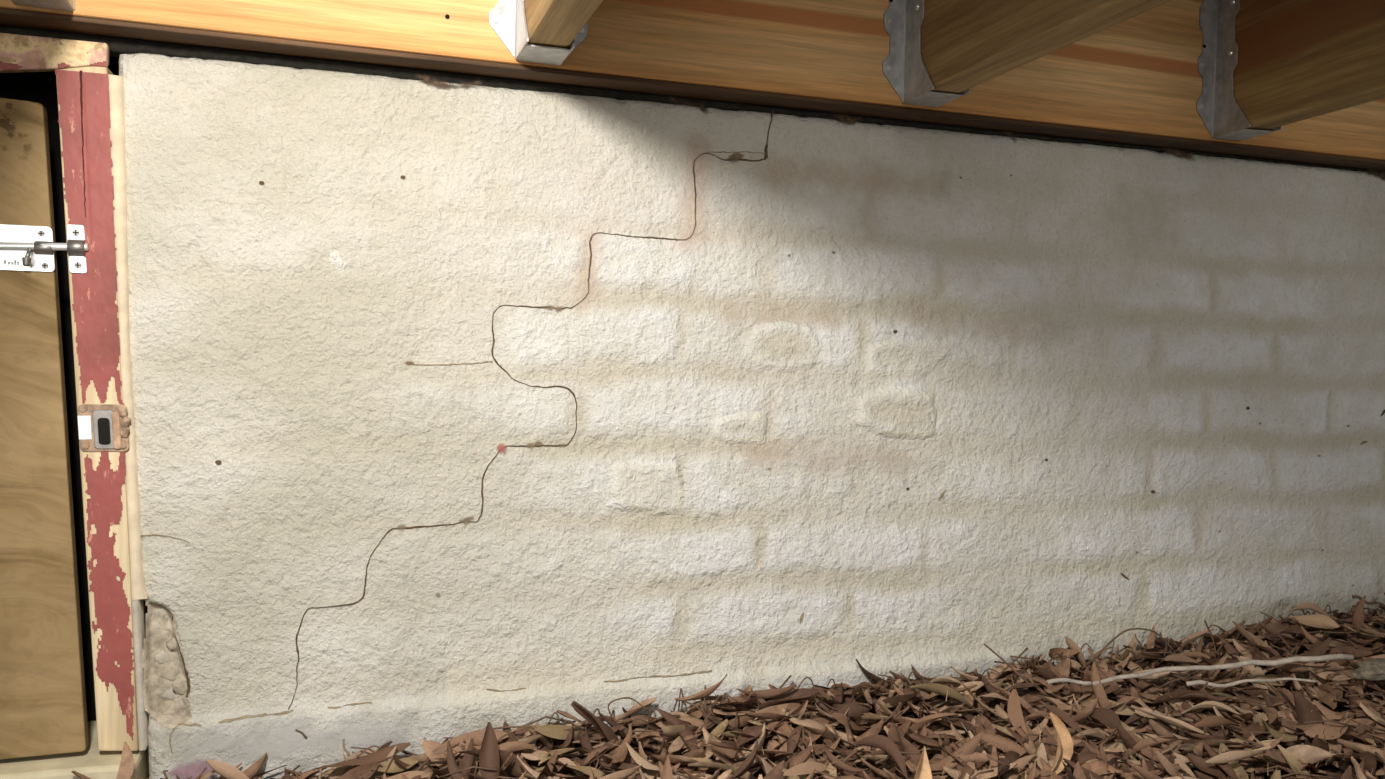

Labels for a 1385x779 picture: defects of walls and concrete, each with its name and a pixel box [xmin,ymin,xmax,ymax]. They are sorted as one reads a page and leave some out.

peeling [55,61,124,405]
peeling [84,452,192,740]
crack [169,111,774,753]